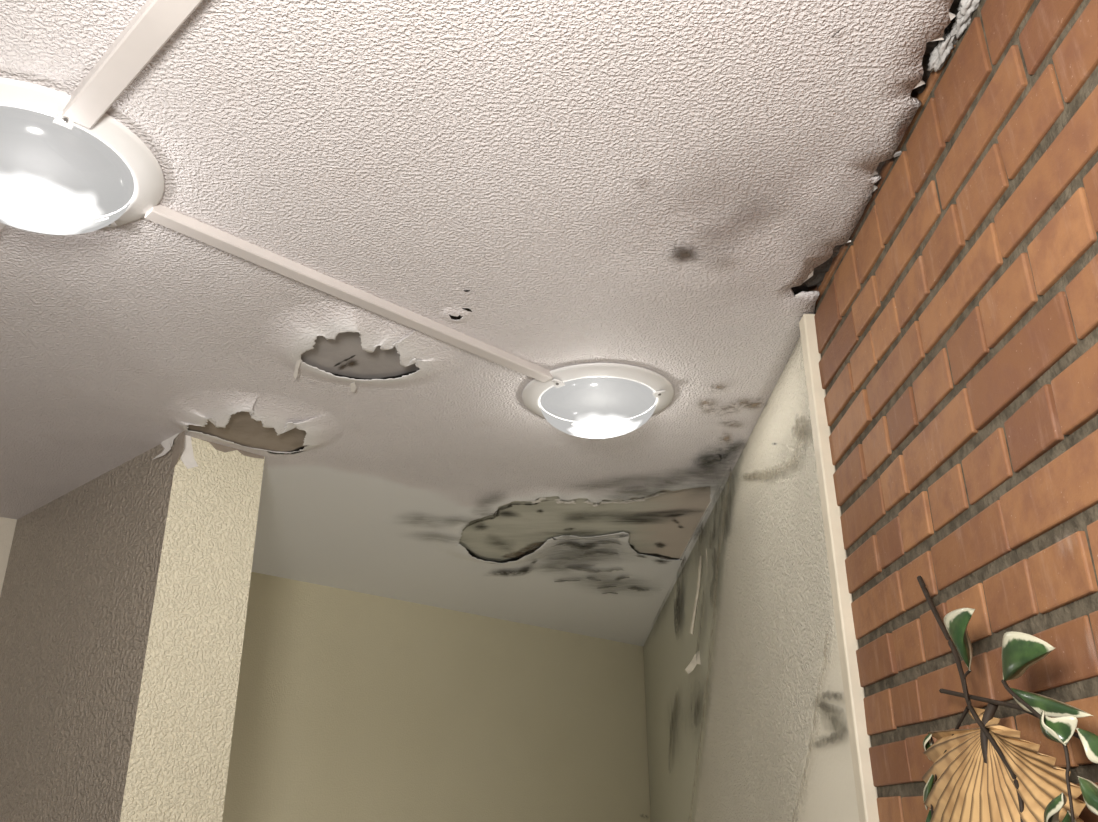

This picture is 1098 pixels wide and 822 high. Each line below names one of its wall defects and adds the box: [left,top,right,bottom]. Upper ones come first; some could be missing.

spalling [913,0,980,93]
spalling [870,151,901,191]
leakage [675,249,693,260]
spalling [791,240,851,297]
peeling [261,300,462,392]
peeling [152,390,344,476]
leakage [455,482,731,594]